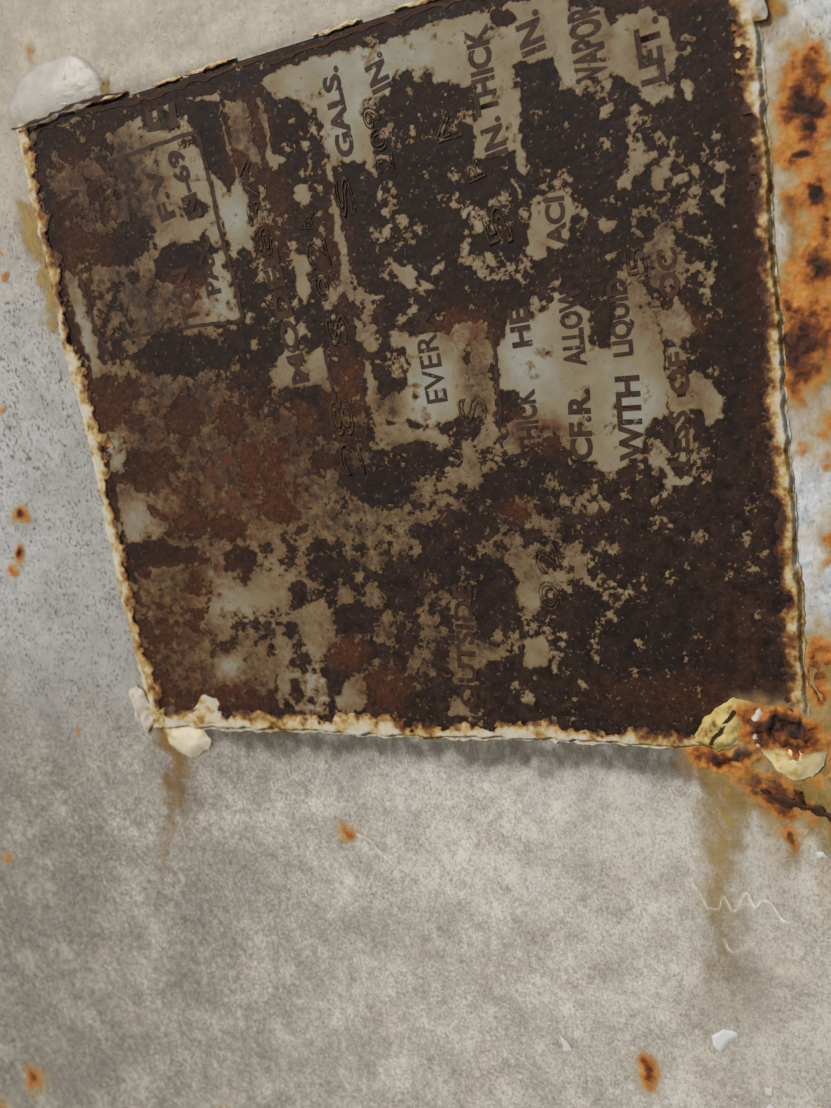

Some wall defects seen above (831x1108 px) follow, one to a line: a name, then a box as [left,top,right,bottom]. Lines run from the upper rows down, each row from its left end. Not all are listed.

corrosion [764,0,786,18]
corrosion [36,0,462,133]
corrosion [770,40,831,406]
corrosion [816,412,831,439]
corrosion [12,505,30,523]
corrosion [821,531,831,566]
corrosion [684,635,831,900]
crack [760,788,831,822]
corrosion [27,1067,42,1091]
corrosion [637,1054,660,1092]